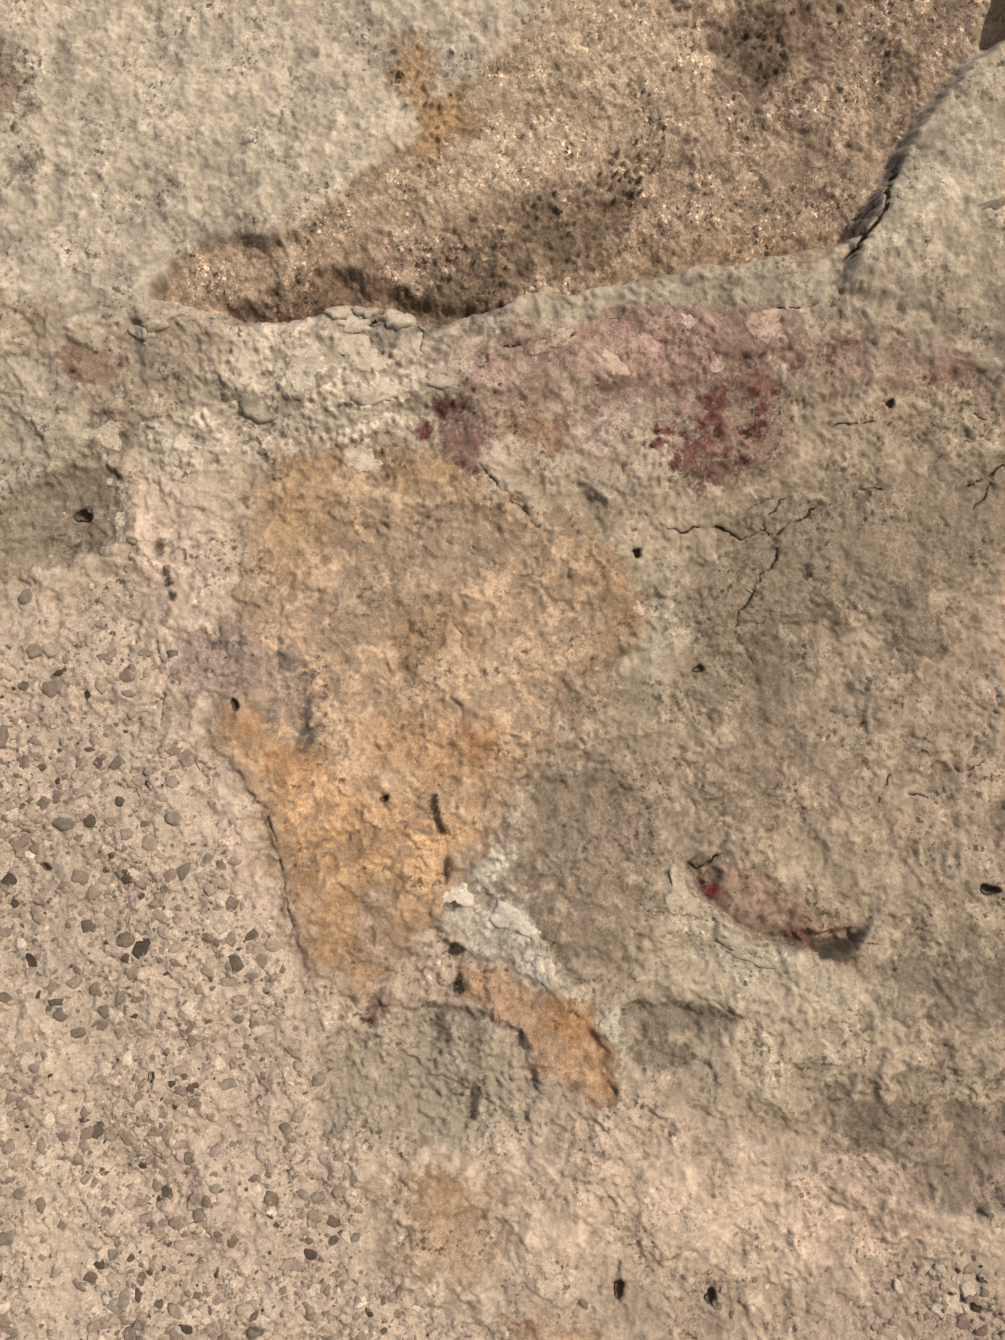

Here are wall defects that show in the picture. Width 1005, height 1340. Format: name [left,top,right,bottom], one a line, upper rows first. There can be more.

flaking render [711,0,816,85]
crack [848,161,900,257]
flaking render [127,305,204,341]
crack [967,464,1005,509]
crack [667,498,816,677]
rust [172,446,643,1004]
rust [459,963,618,1108]